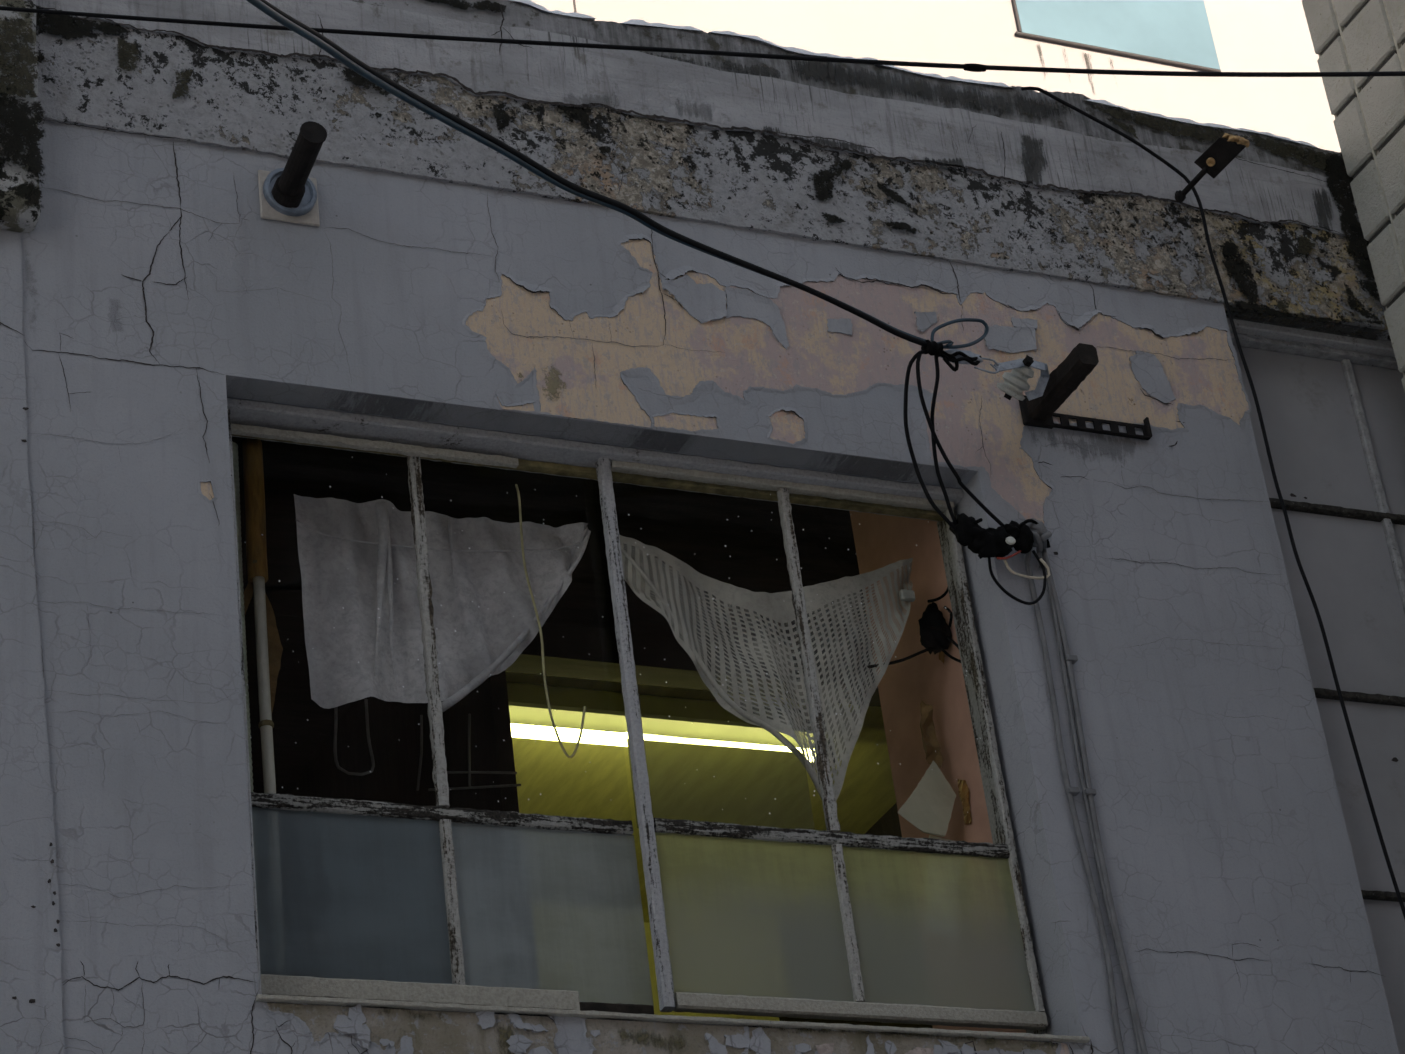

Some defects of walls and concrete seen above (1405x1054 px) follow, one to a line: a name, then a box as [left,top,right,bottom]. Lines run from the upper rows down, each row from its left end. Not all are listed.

water stain [36,6,131,40]
water stain [640,51,1073,120]
water stain [0,97,45,208]
water stain [764,126,874,223]
water stain [877,181,918,234]
water stain [1219,154,1386,341]
peeling [462,233,1251,527]
crack [30,494,221,658]
crack [33,884,296,1054]
crack [1141,943,1271,986]
peeling [264,1002,560,1054]
peeling [582,1018,1071,1054]